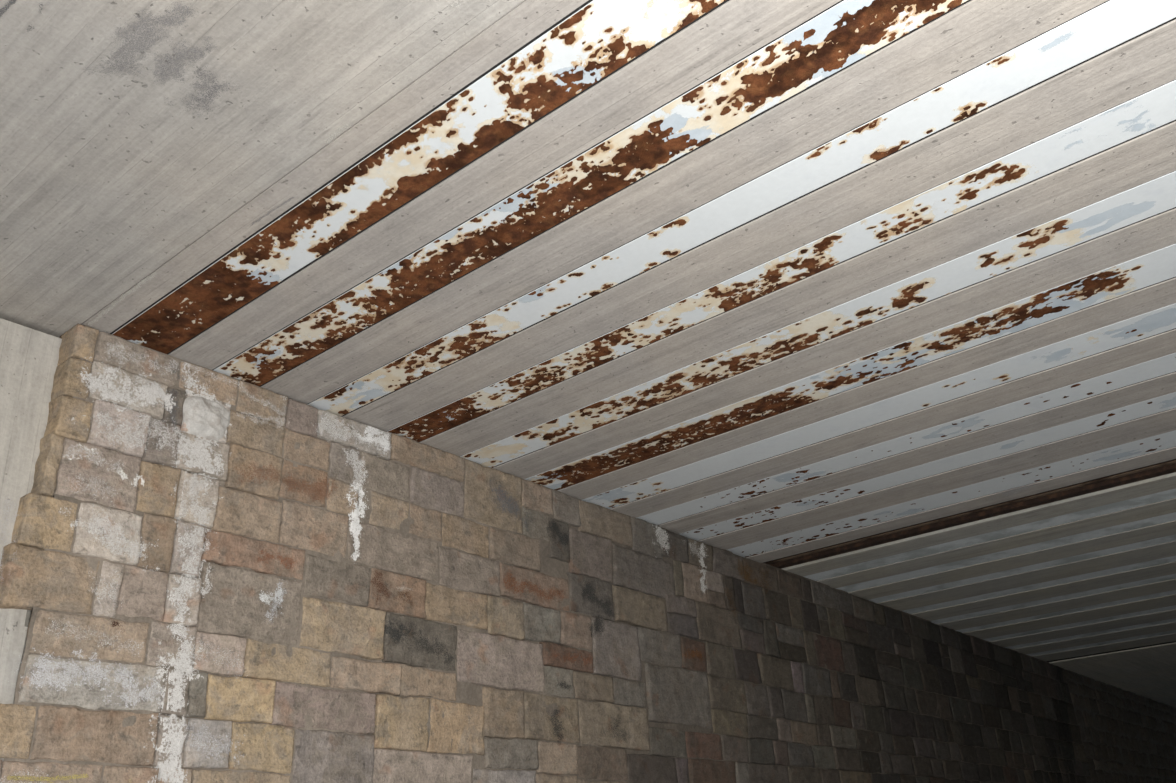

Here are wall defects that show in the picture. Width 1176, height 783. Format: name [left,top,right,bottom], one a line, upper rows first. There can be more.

rust [677,0,962,121]
rust [113,5,649,354]
peeling [309,256,619,416]
rust [221,120,711,390]
peeling [112,0,967,383]
peeling [390,232,847,439]
rust [678,235,842,312]
rust [514,266,1141,490]
peeling [860,161,1037,243]
damp [0,342,290,783]
damp [259,579,296,624]
efflorescence [313,413,391,564]